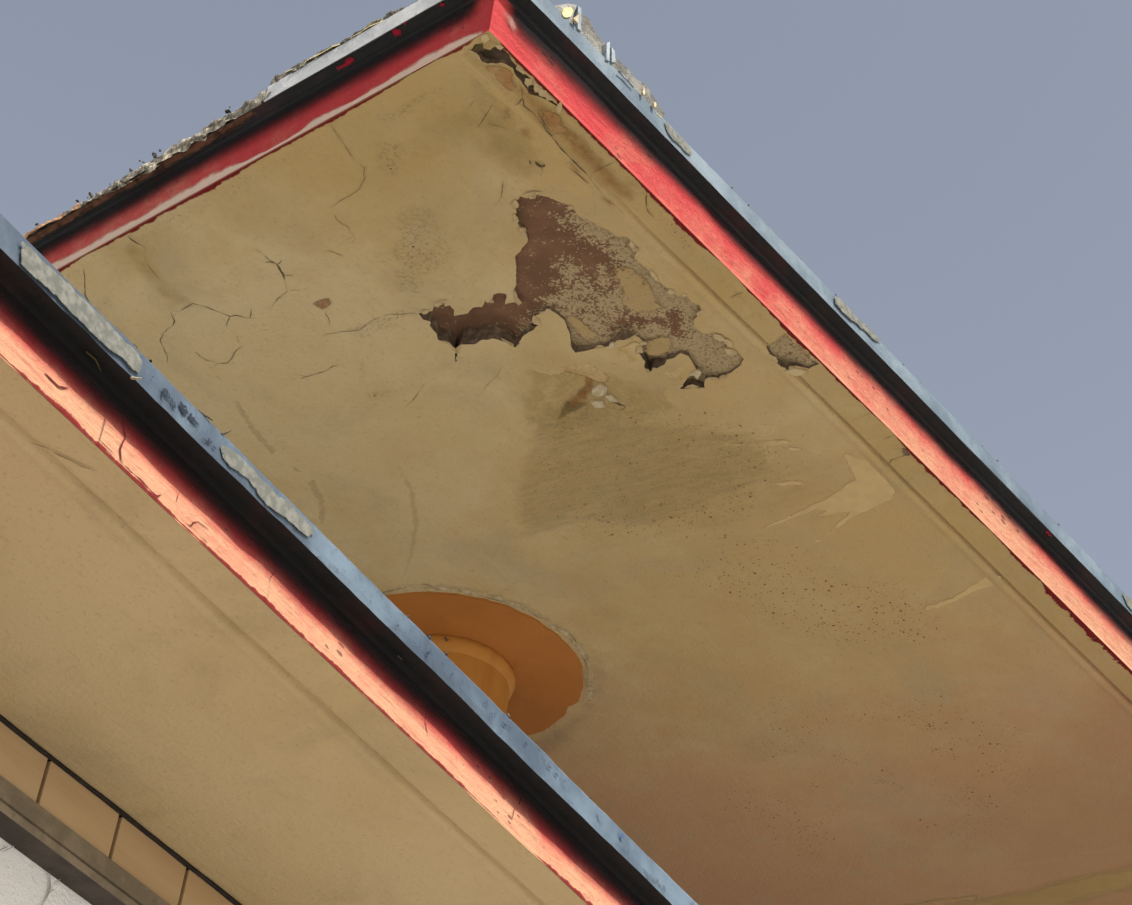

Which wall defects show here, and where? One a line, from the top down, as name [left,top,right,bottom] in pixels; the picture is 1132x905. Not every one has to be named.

spalling [469,34,562,114]
crack [133,250,301,369]
spalling [419,191,744,390]
spalling [766,333,819,376]
peeling [590,383,618,408]